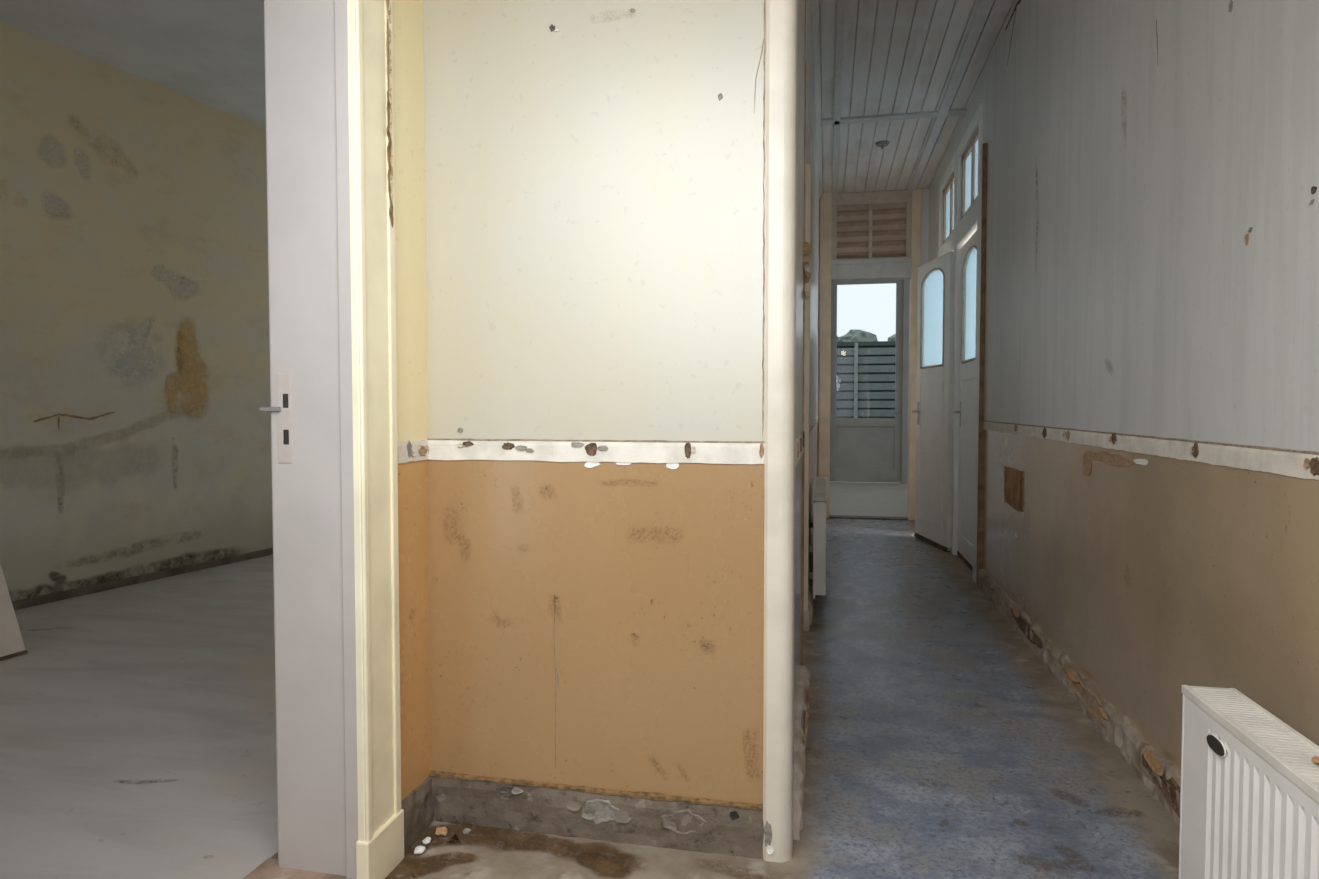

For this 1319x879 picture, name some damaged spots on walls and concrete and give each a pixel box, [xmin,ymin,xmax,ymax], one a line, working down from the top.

crack [386,0,394,228]
water stain [19,571,125,599]